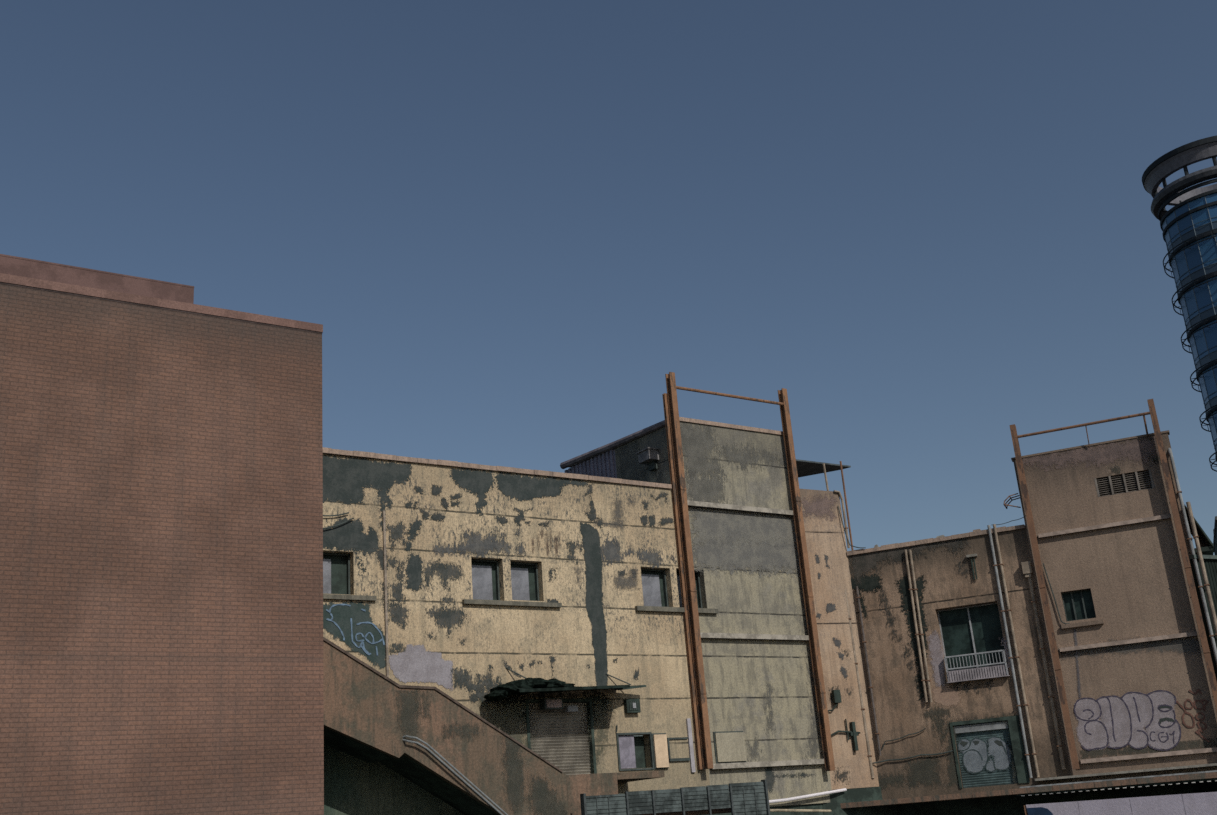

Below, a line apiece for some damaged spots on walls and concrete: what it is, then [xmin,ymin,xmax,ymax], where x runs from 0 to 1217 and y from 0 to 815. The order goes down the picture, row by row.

peeling [323,454,588,655]
peeling [450,655,556,703]
leakage [849,538,995,790]